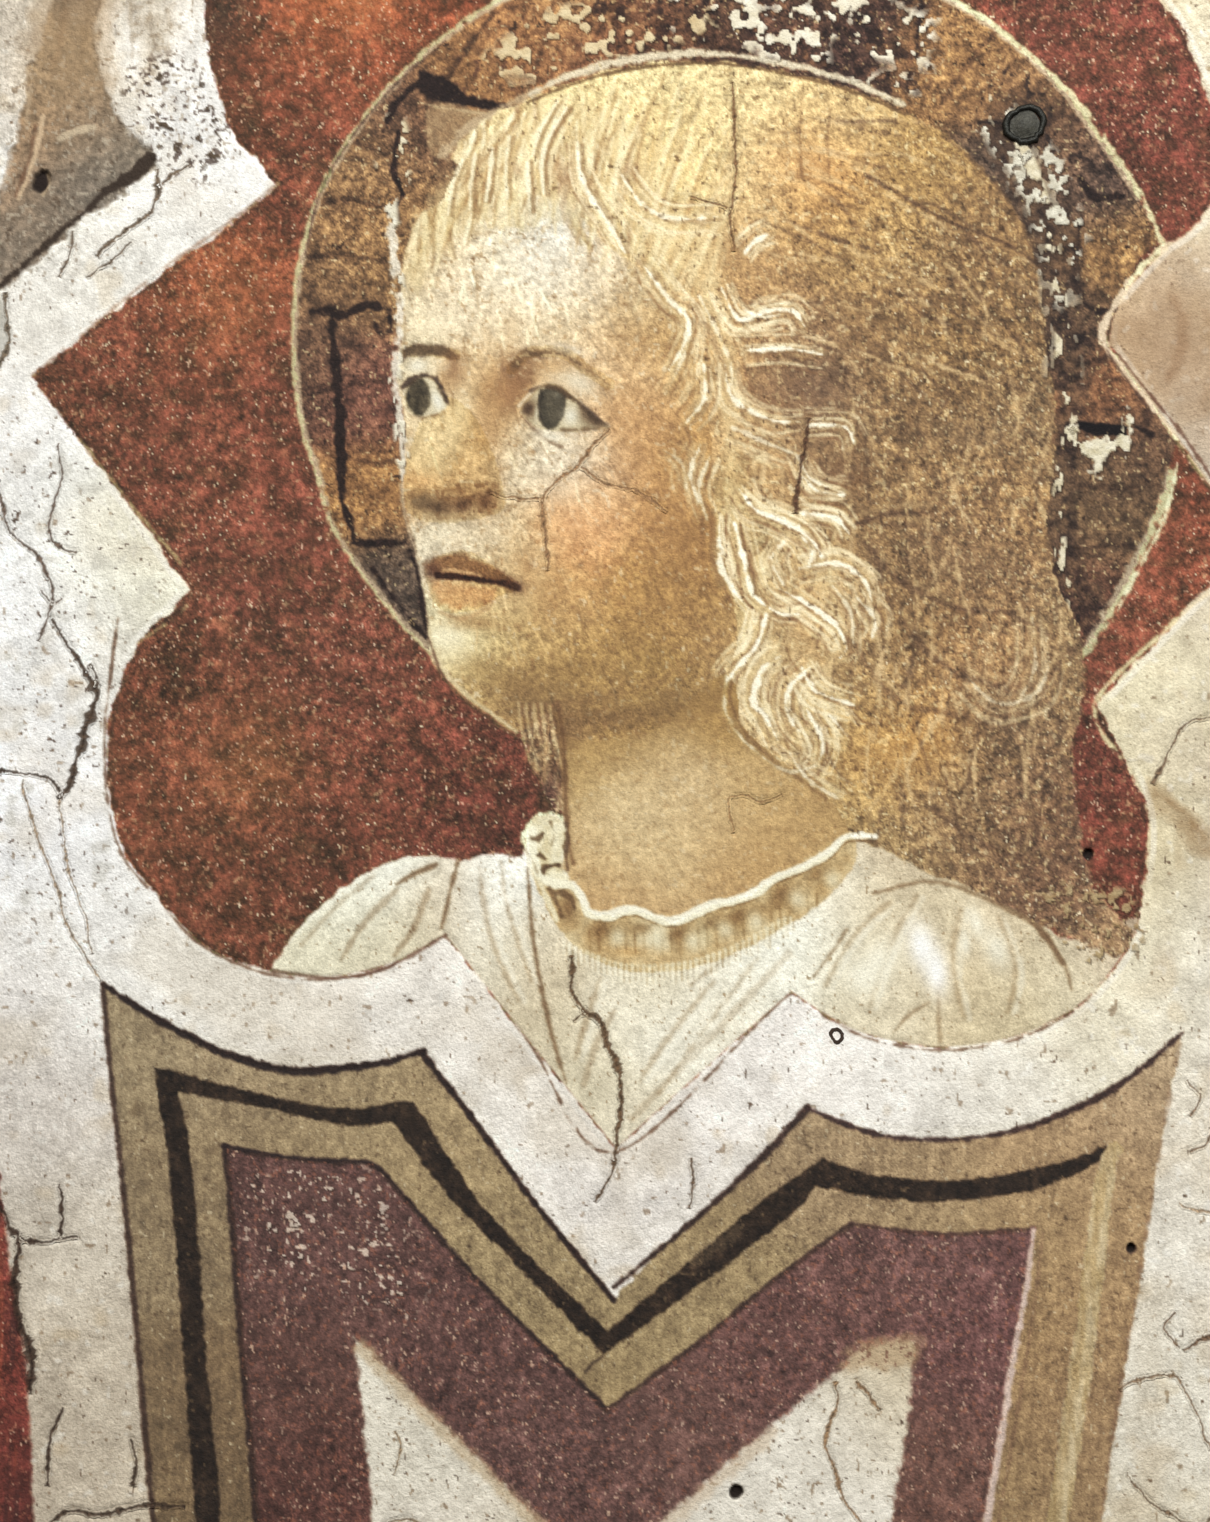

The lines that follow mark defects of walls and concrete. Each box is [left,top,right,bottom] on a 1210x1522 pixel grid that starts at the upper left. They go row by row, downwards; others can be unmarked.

peeling [478,0,945,99]
crack [0,292,12,369]
peeling [974,74,1136,611]
crack [490,427,668,570]
crack [0,443,102,981]
crack [567,955,626,1203]
crack [686,1157,697,1208]